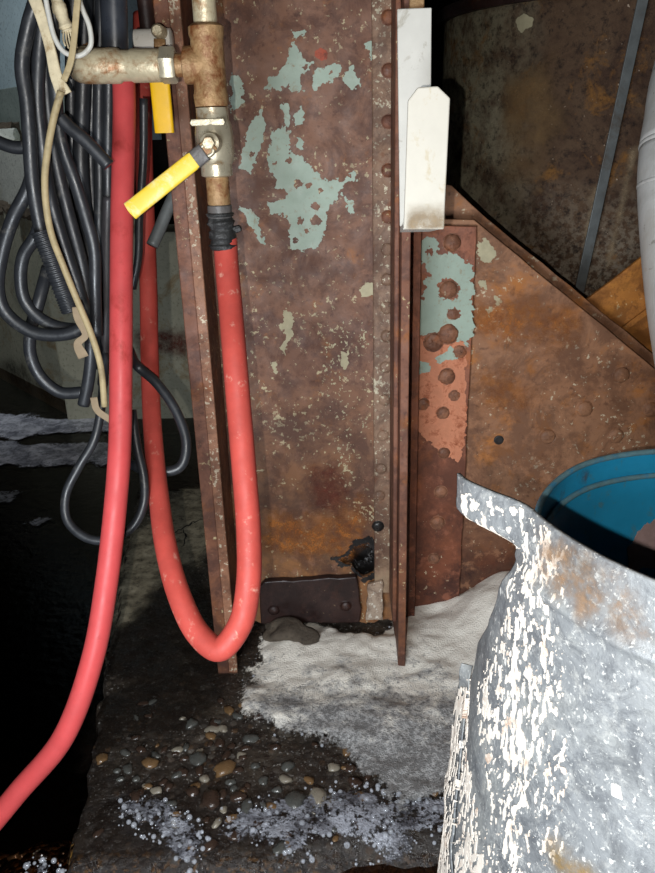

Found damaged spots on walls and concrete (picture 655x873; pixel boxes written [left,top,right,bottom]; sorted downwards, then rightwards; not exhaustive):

peeling [229,73,245,113]
peeling [264,30,361,93]
peeling [238,103,358,252]
rust [408,213,443,229]
peeling [418,236,502,462]
peeling [319,320,373,487]
rust [542,546,601,614]